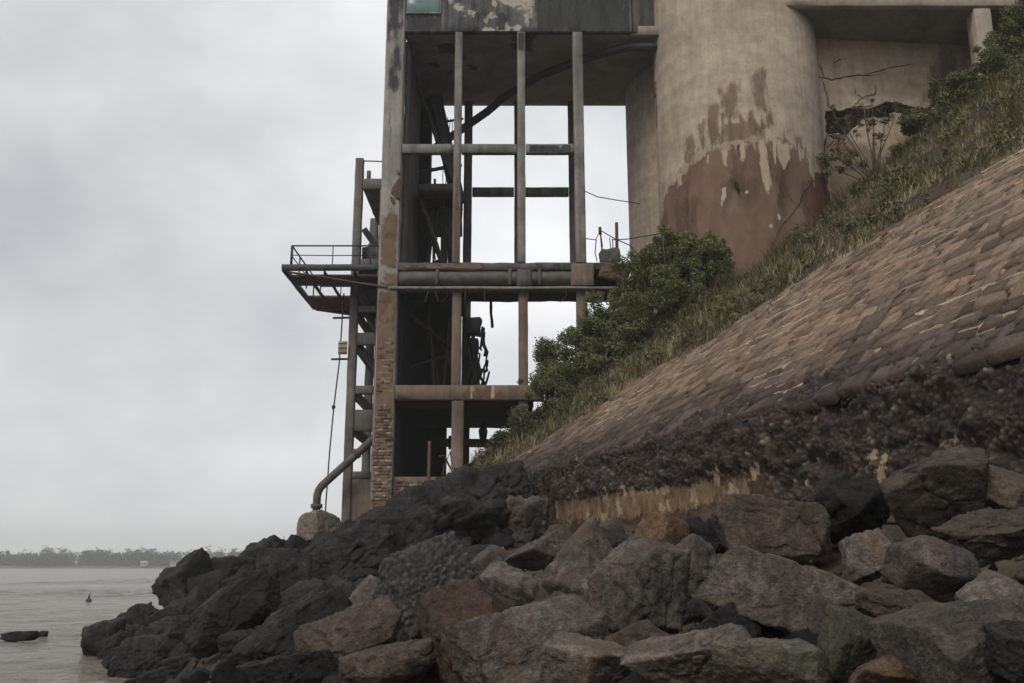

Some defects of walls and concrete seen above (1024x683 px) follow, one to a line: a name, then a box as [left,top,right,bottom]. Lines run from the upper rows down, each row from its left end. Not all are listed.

peeling [448,0,535,31]
leakage [388,0,441,91]
spalling [825,104,909,140]
crack [767,59,910,255]
spalling [390,170,401,205]